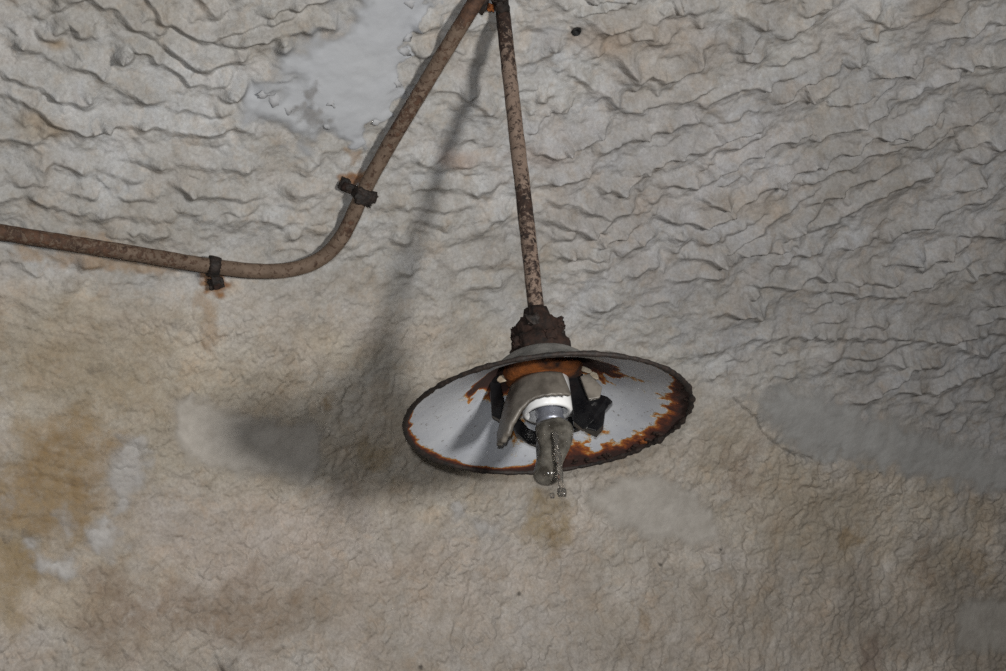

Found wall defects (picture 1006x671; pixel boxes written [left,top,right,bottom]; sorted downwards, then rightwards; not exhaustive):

peeling [242,0,443,153]
water stain [111,438,144,511]
water stain [37,557,75,579]
water stain [87,517,116,553]